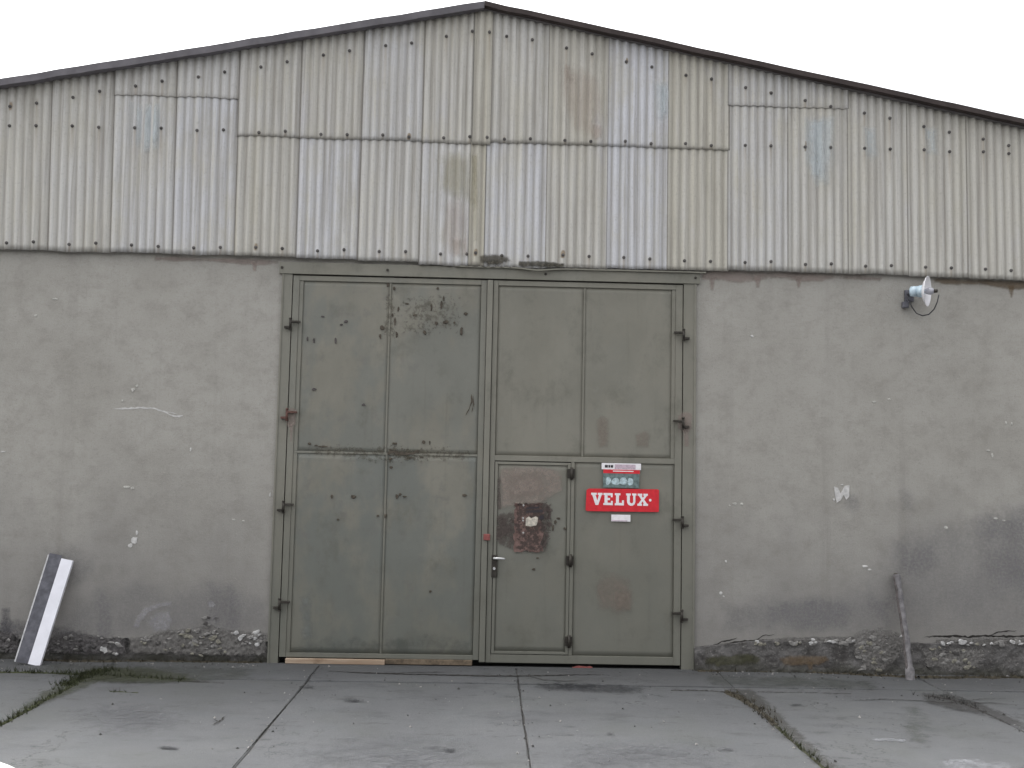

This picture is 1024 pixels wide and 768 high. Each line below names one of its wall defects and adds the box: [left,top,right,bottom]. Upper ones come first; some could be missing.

peeling [423,287,468,335]
flaking render [0,631,18,652]
flaking render [46,616,266,657]
crack [926,630,1024,638]